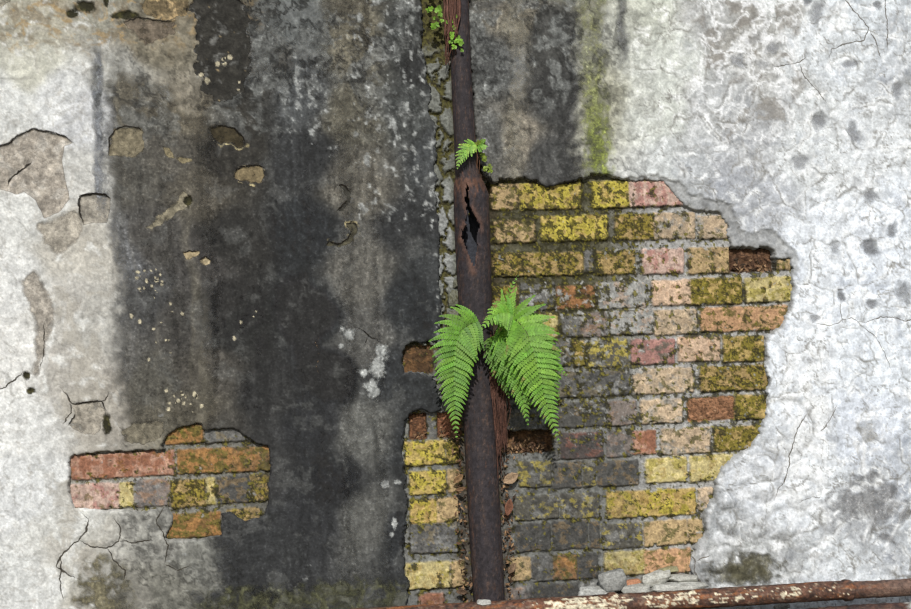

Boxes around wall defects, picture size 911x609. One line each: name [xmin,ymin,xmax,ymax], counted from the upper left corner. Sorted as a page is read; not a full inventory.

flaking render [124,0,252,102]
crack [829,0,888,58]
flaking render [0,128,111,254]
flaking render [235,164,264,187]
crack [64,392,108,422]
spalling [70,421,271,539]
leakage [92,0,443,609]
spalling [402,0,474,605]
spalling [478,156,793,600]
crack [777,406,837,492]
crack [816,304,911,367]
crack [56,507,188,597]